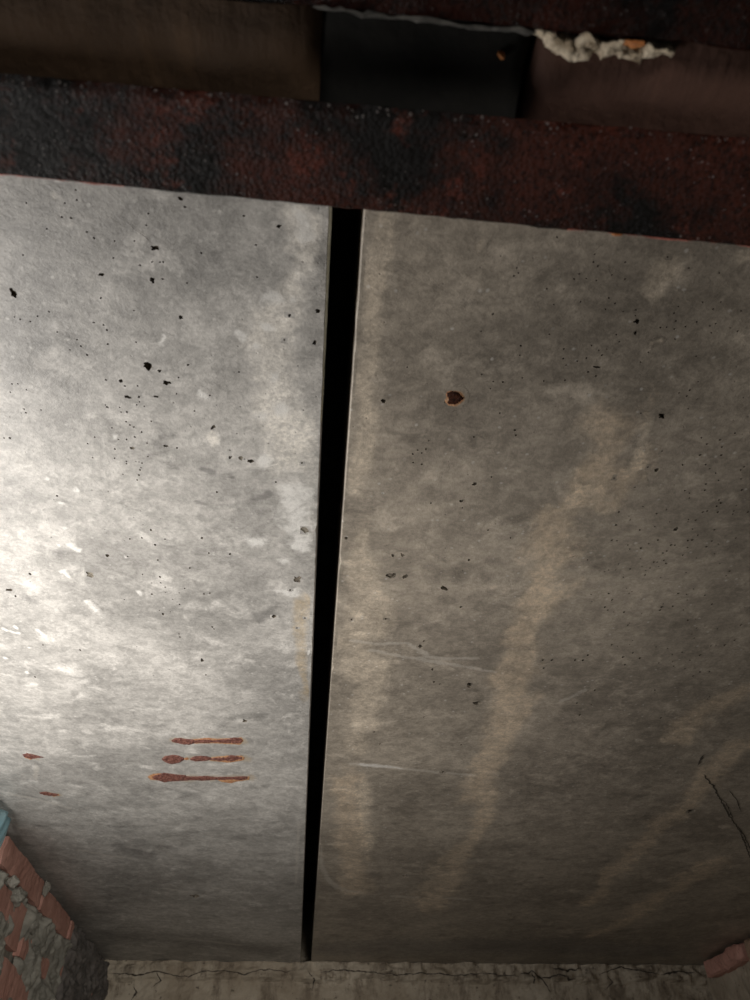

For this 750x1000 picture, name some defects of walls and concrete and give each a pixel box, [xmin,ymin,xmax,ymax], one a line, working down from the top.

spalling [534,30,675,64]
rust [440,387,470,410]
rust [19,751,44,762]
rust [144,735,259,785]
crack [703,774,750,857]
crack [112,966,694,1000]